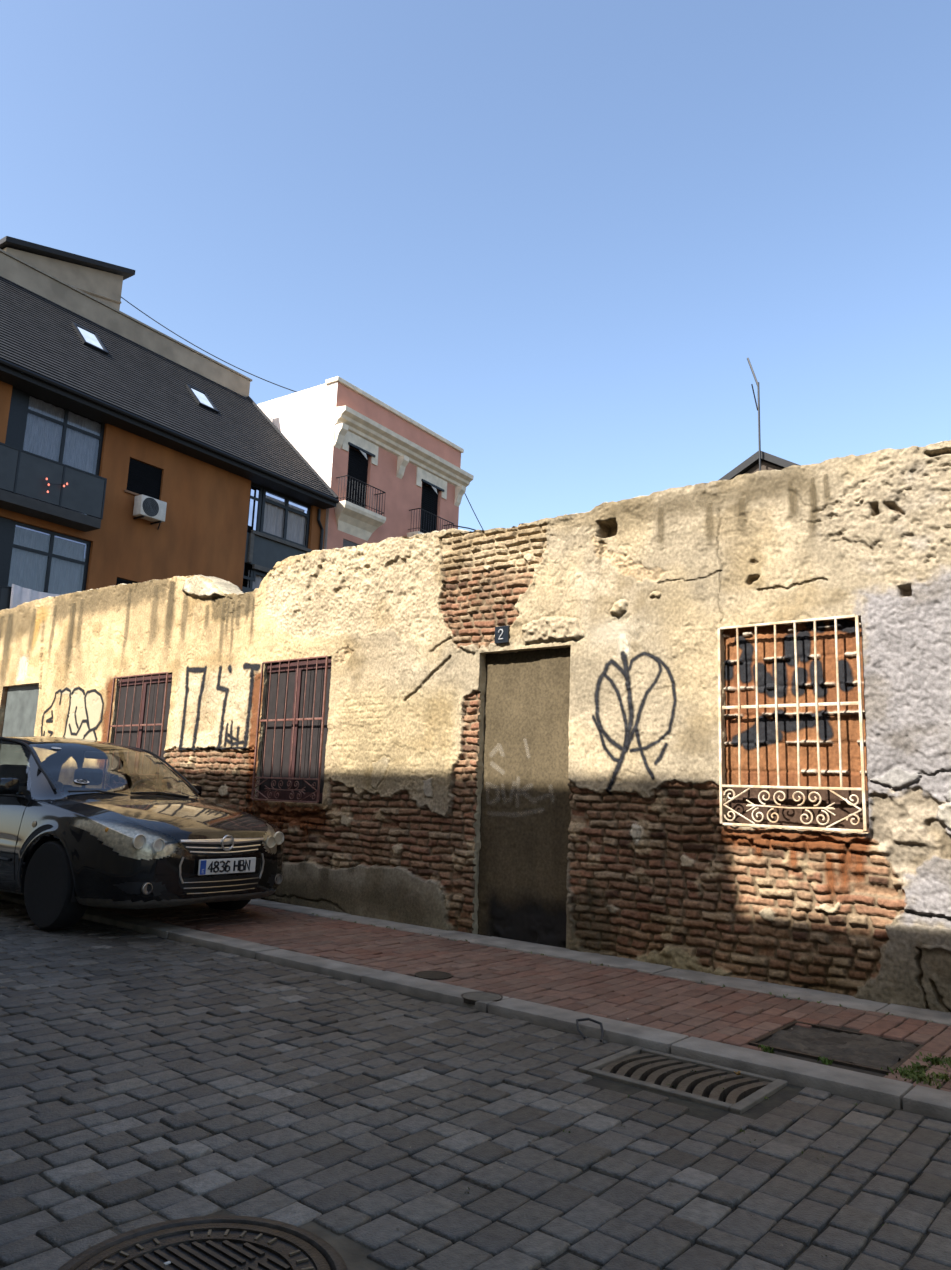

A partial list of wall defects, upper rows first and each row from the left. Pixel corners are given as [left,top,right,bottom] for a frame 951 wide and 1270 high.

flaking render [265,519,553,666]
flaking render [161,743,257,815]
flaking render [272,687,481,933]
flaking render [566,766,951,997]
crack [904,909,951,1013]